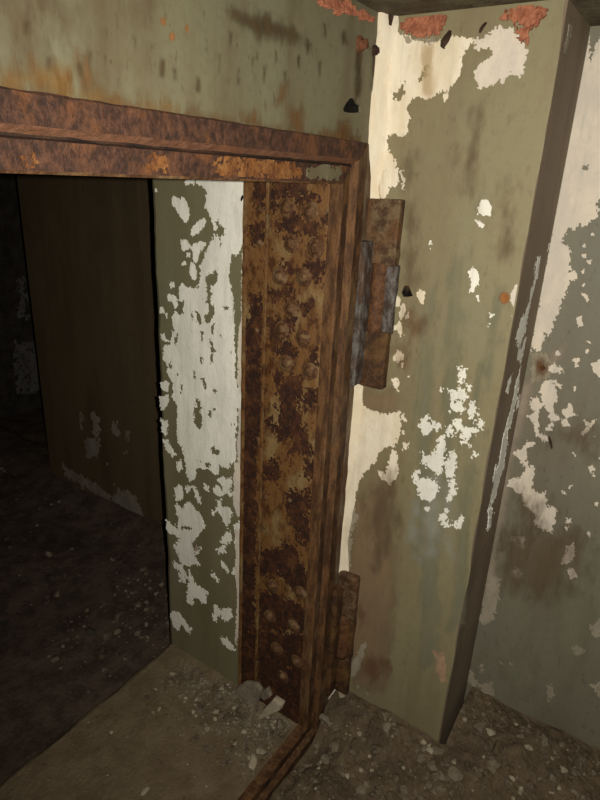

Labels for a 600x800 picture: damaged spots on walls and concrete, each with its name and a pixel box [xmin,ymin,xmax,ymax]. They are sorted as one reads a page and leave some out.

rust [147,152,168,174]
peeling [159,179,244,651]
rust [212,156,328,248]
rust [241,257,326,724]
peeling [348,401,410,567]
peeling [391,349,410,392]
peeling [394,295,409,337]
peeling [411,365,485,529]
peeling [378,5,549,199]
peeling [468,267,480,302]
peeling [475,199,492,228]
peeling [486,36,600,534]